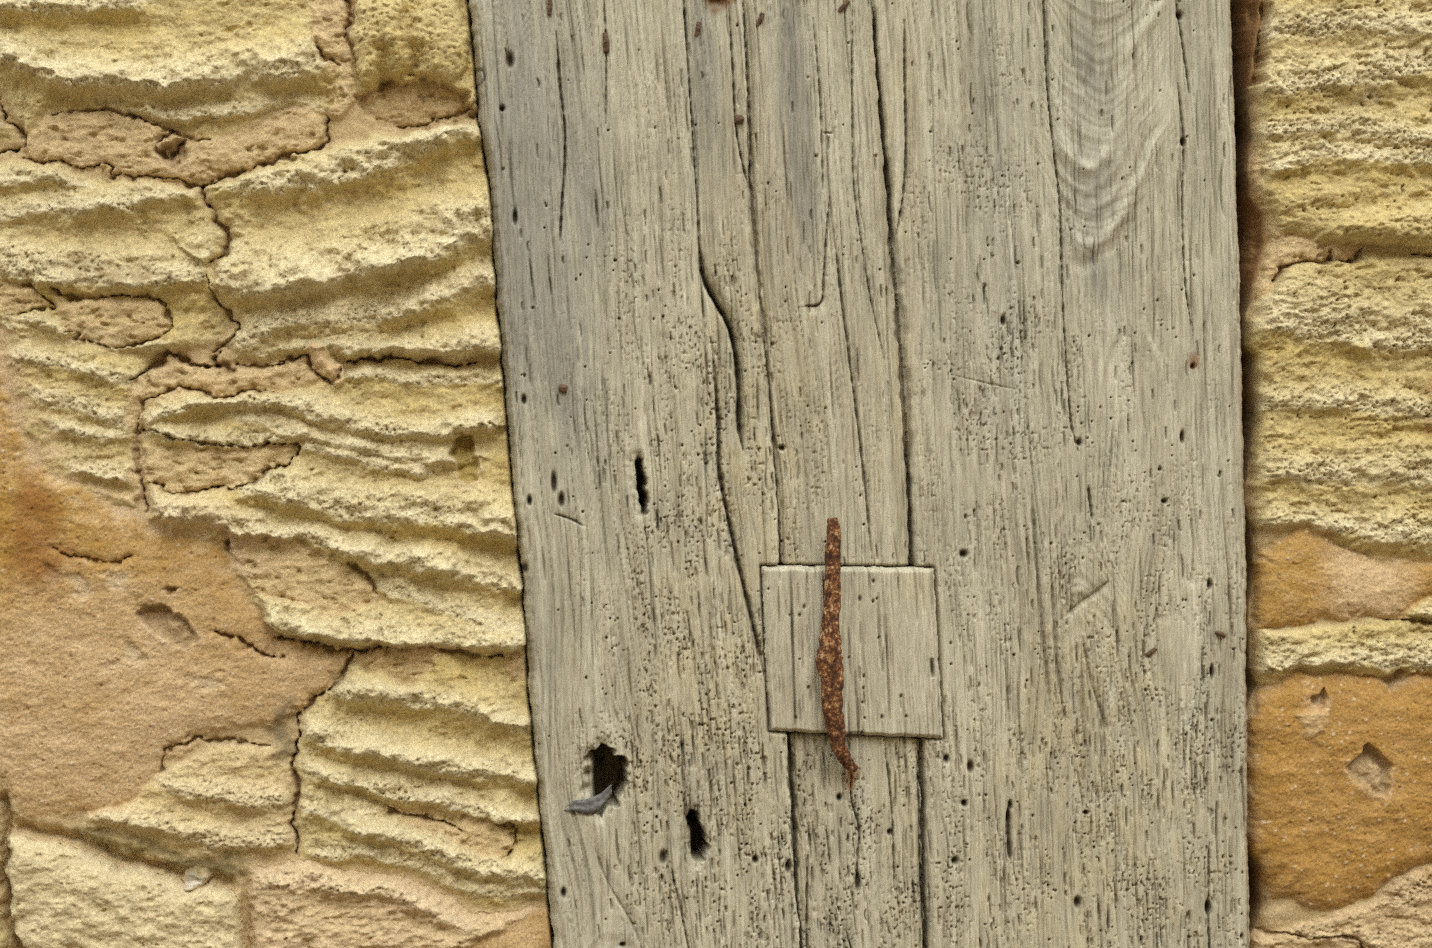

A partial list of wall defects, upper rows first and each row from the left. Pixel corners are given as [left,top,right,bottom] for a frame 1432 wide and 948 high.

crack [315,0,352,67]
crack [1271,248,1365,283]
crack [0,97,478,513]
crack [53,548,133,565]
crack [347,562,378,594]
crack [424,646,505,659]
crack [160,631,390,855]
crack [385,804,463,832]
crack [497,821,518,857]